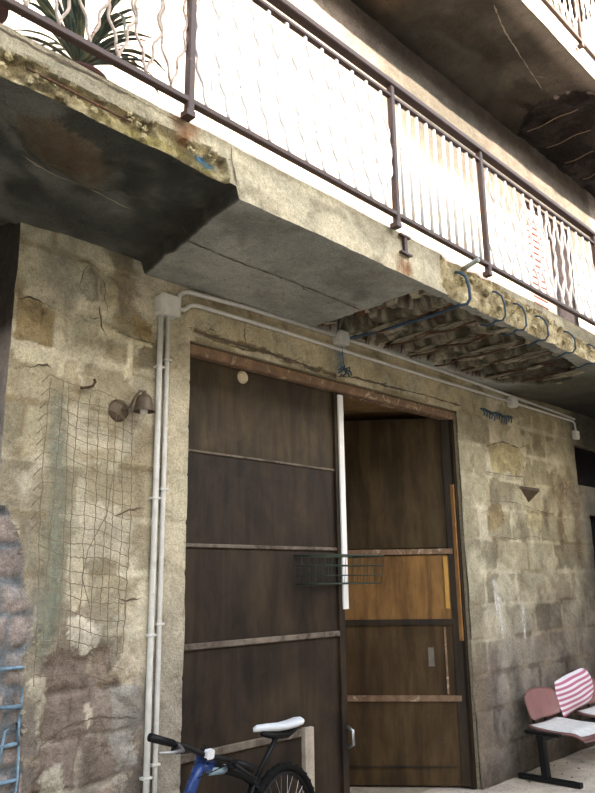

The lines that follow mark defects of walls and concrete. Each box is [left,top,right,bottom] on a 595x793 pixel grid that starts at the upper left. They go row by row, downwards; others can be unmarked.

crack [494,6,544,90]
crack [88,281,150,343]
crack [183,228,359,310]
spalling [439,255,595,363]
spalling [0,505,41,793]
spalling [30,631,133,793]
crack [32,682,137,761]